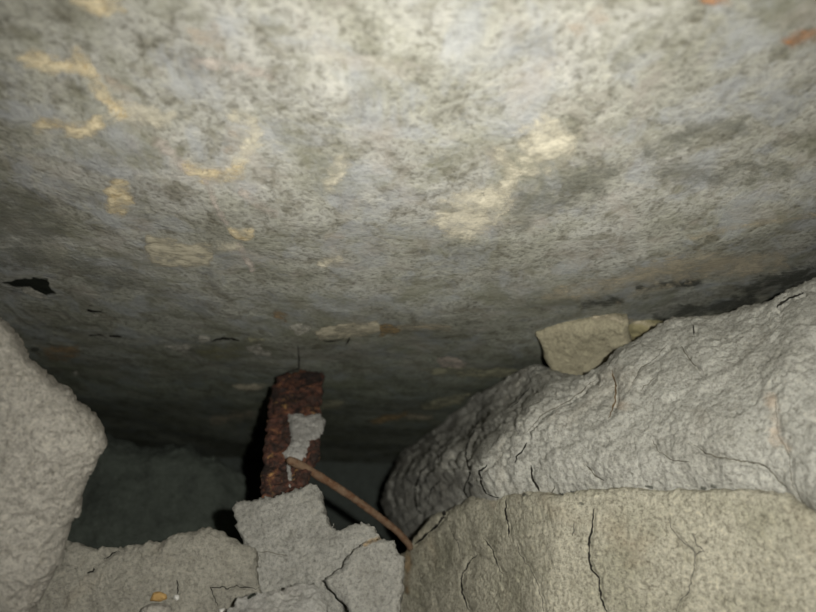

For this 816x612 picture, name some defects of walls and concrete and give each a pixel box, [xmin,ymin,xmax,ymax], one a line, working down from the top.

spalling [4,277,55,299]
corrosion [294,444,321,486]
crack [515,325,698,492]
crack [653,398,805,504]
crack [572,509,607,612]